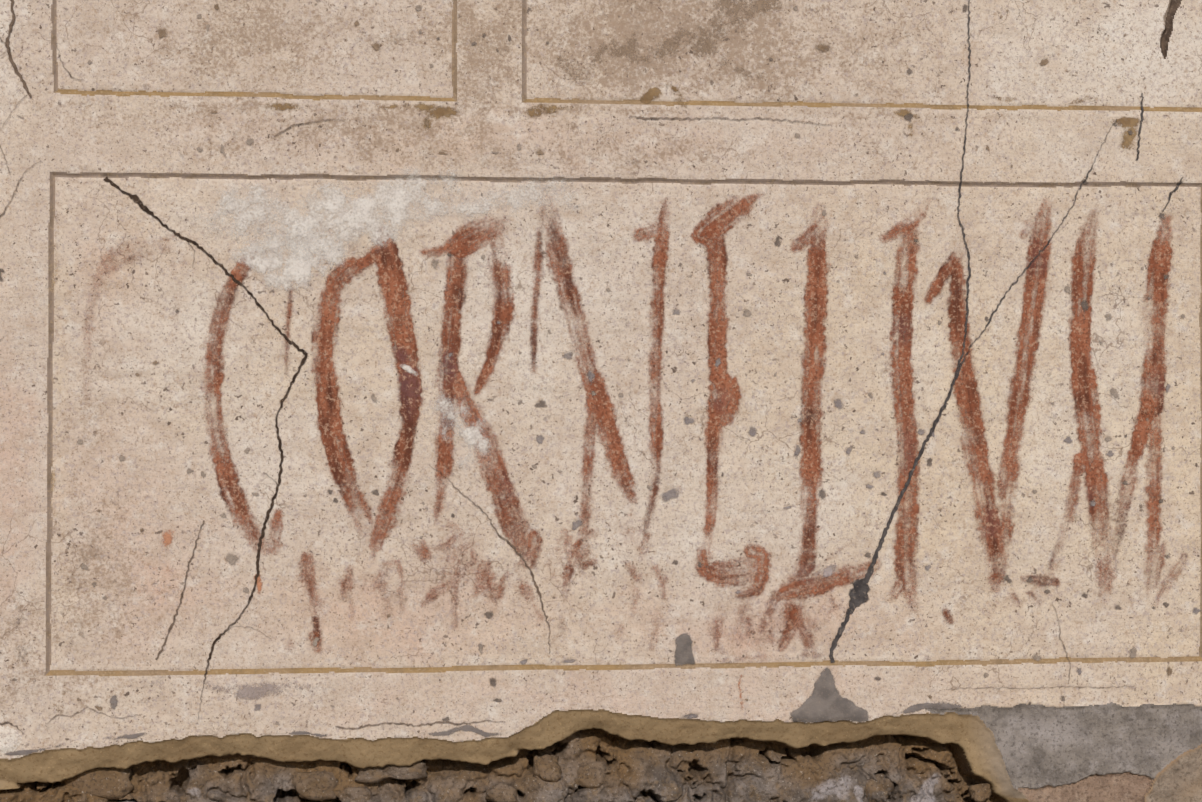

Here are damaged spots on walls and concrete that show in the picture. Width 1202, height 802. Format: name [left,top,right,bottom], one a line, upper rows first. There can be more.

crack [5,0,32,98]
crack [1136,93,1144,160]
crack [1163,177,1183,212]
crack [829,0,1093,663]
crack [103,177,308,682]
spalling [0,695,1029,802]